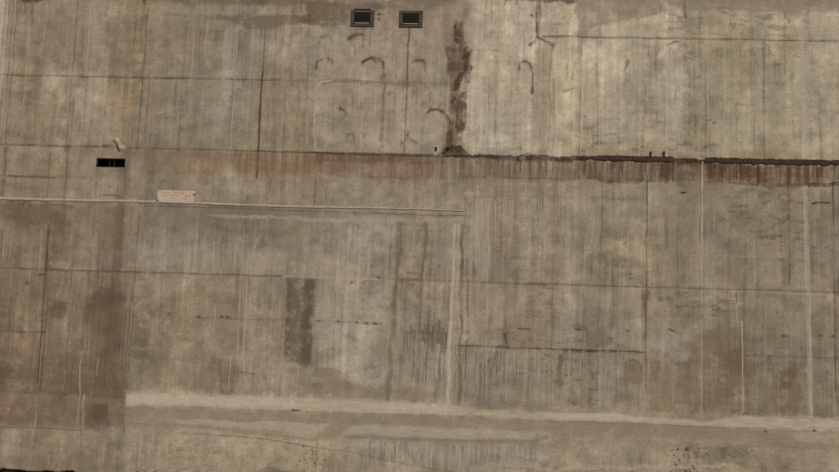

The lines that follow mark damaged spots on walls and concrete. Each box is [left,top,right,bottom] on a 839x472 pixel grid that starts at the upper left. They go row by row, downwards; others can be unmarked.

spalling [432,17,474,155]
damp [477,0,839,160]
corrosion [233,145,839,216]
damp [0,179,611,433]
damp [610,161,814,420]
damp [0,447,130,472]
damp [685,440,755,470]